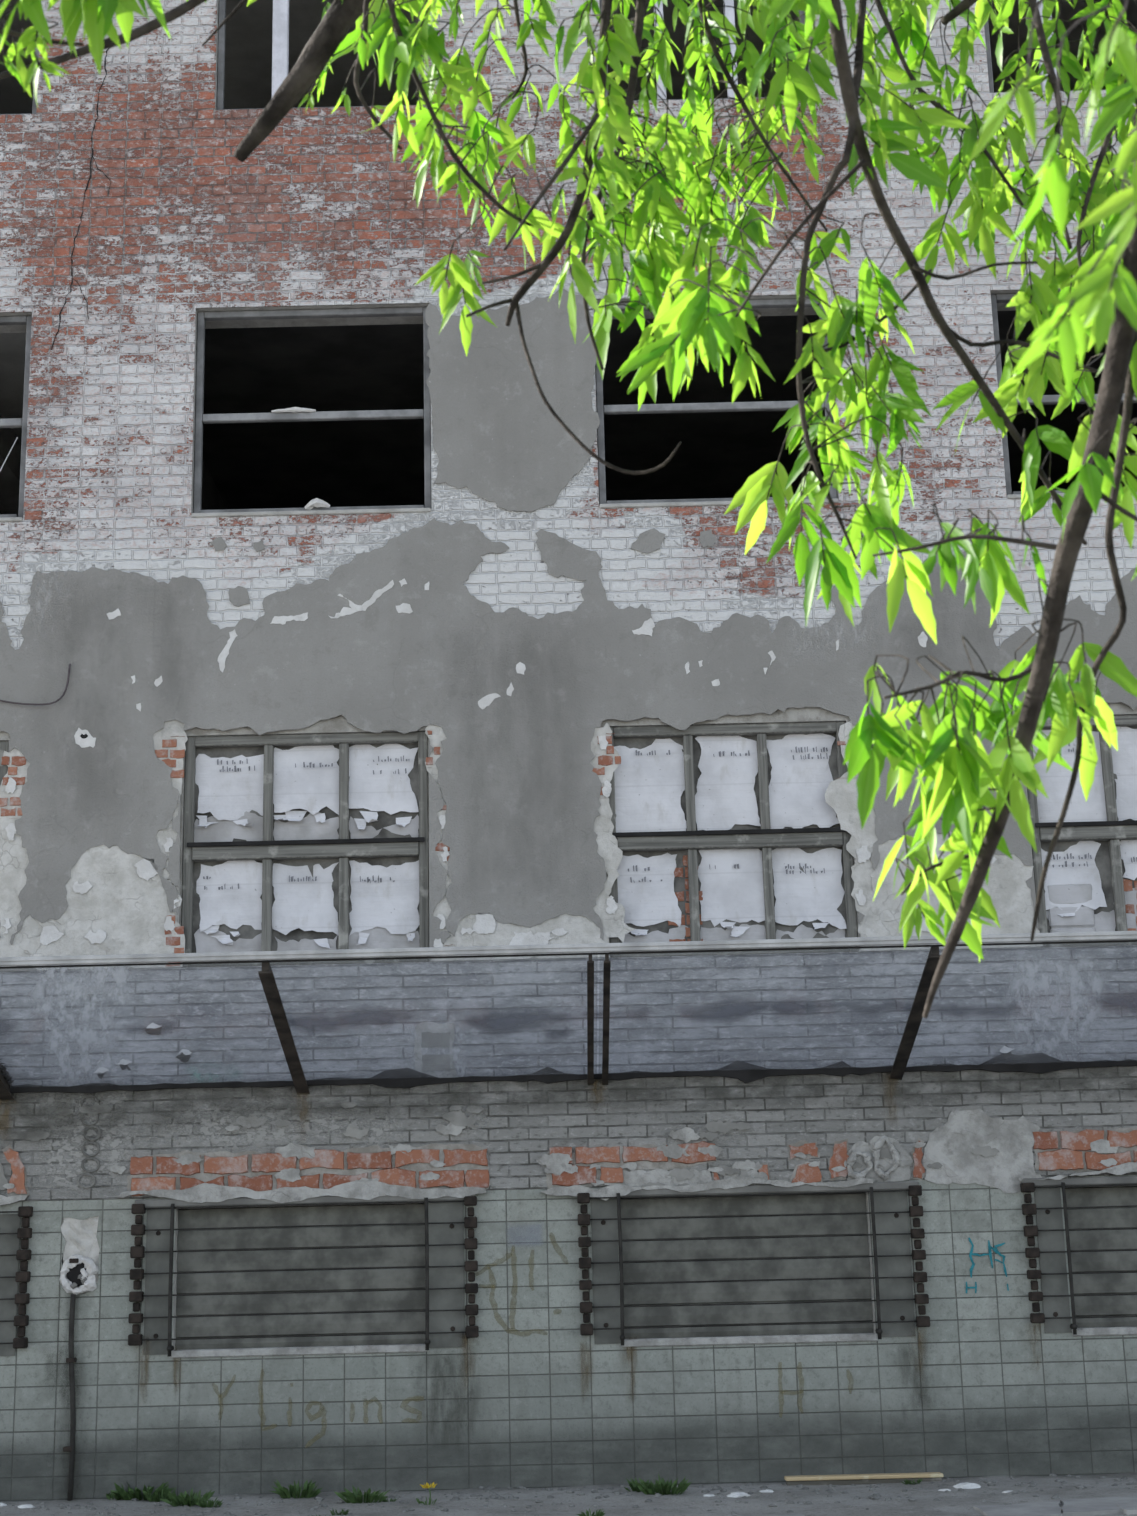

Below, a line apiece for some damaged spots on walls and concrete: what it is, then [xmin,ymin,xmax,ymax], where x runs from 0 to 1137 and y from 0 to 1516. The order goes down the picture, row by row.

crack [51,48,111,350]
flaking render [425,289,600,512]
flaking render [631,528,665,553]
flaking render [228,586,250,607]
flaking render [270,612,308,625]
flaking render [328,578,413,618]
flaking render [632,618,655,636]
flaking render [0,720,188,970]
flaking render [425,723,635,961]
flaking render [0,1059,490,1197]
flaking render [536,1120,770,1189]
peeling [787,1109,1137,1193]